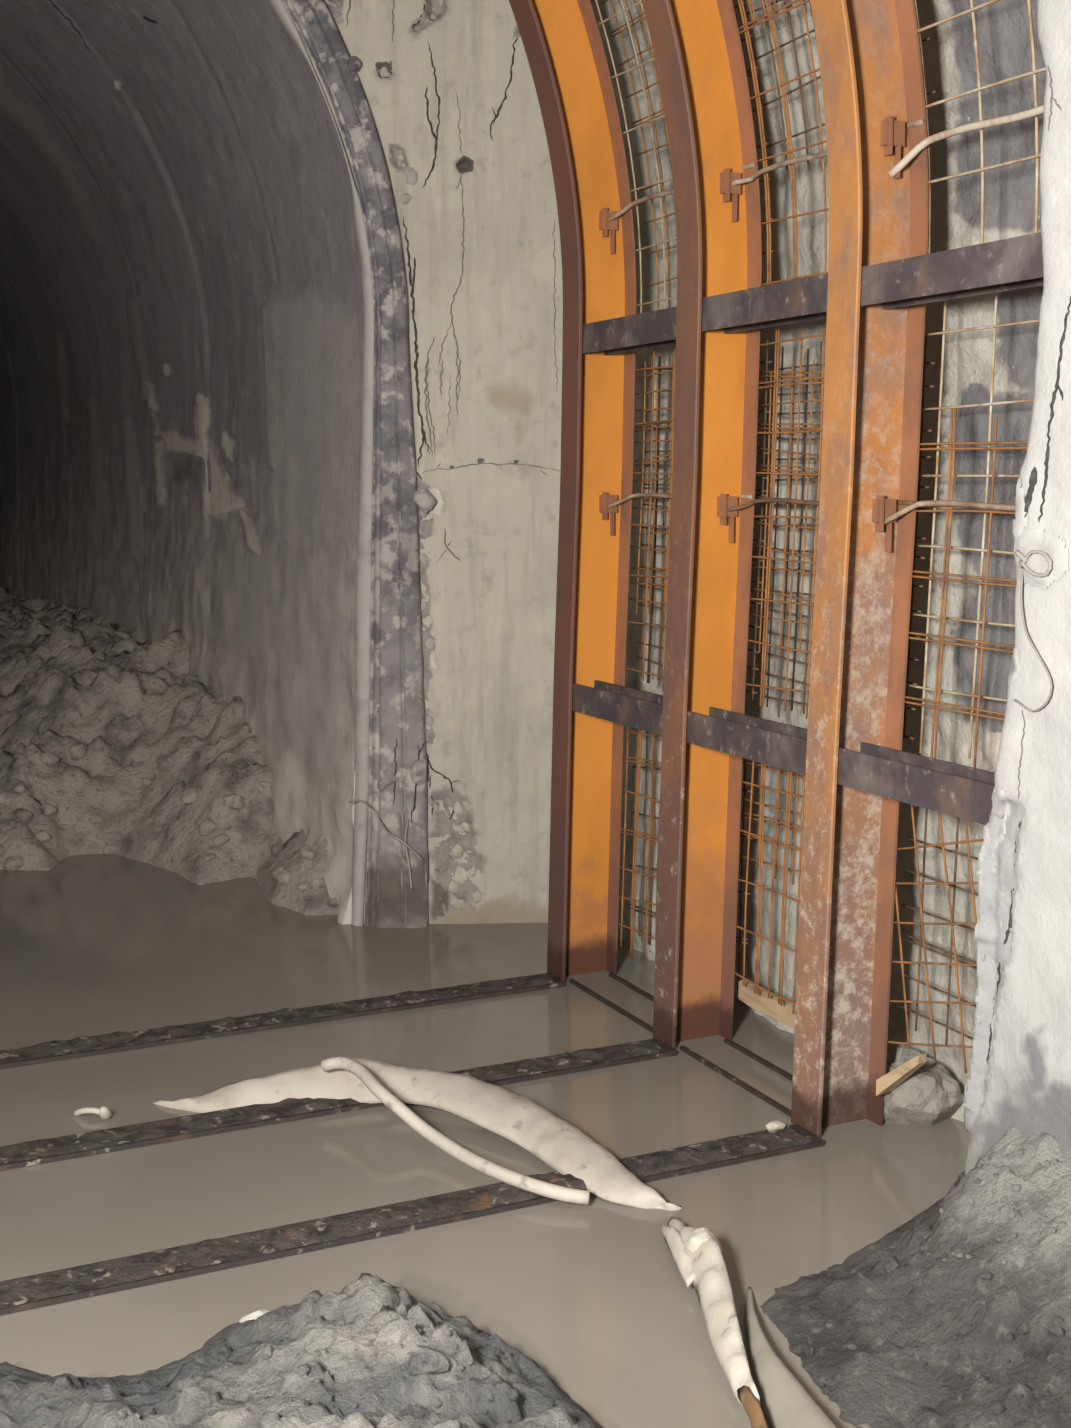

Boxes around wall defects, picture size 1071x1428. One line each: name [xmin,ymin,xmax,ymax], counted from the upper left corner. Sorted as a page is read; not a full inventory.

crack [389,0,397,42]
spalling [405,0,451,37]
crack [403,38,559,488]
crack [1038,297,1071,522]
spalling [416,472,447,748]
crack [393,739,460,824]
spalling [428,773,494,914]
crack [986,710,1025,1064]